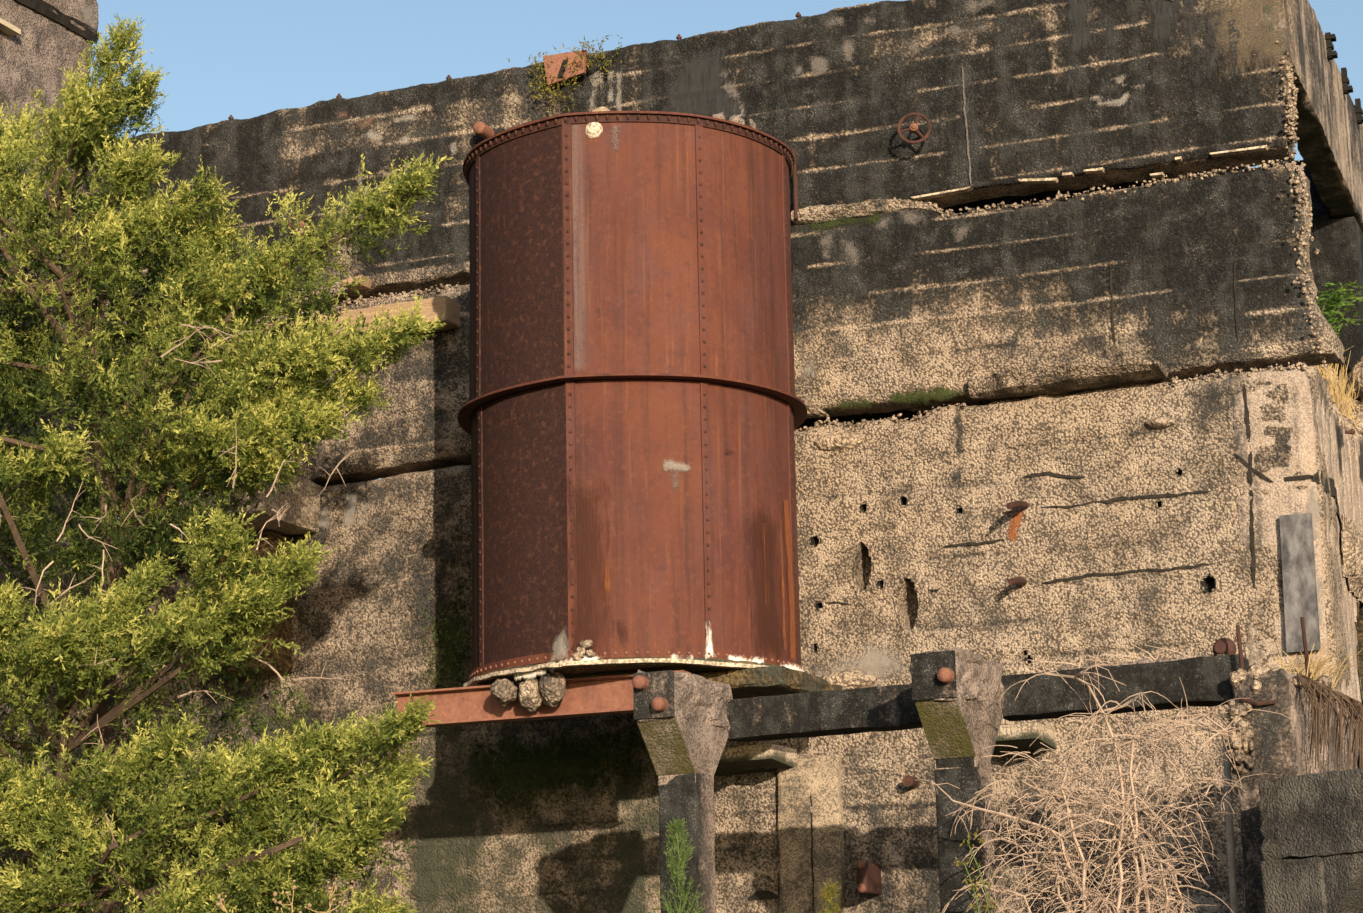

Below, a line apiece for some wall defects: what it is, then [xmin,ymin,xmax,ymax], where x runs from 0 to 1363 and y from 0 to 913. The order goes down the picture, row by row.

spalling [1275,40,1328,369]
spalling [1335,411,1363,482]
corrosion [782,499,795,660]
corrosion [1009,510,1023,541]
spalling [1338,514,1363,602]